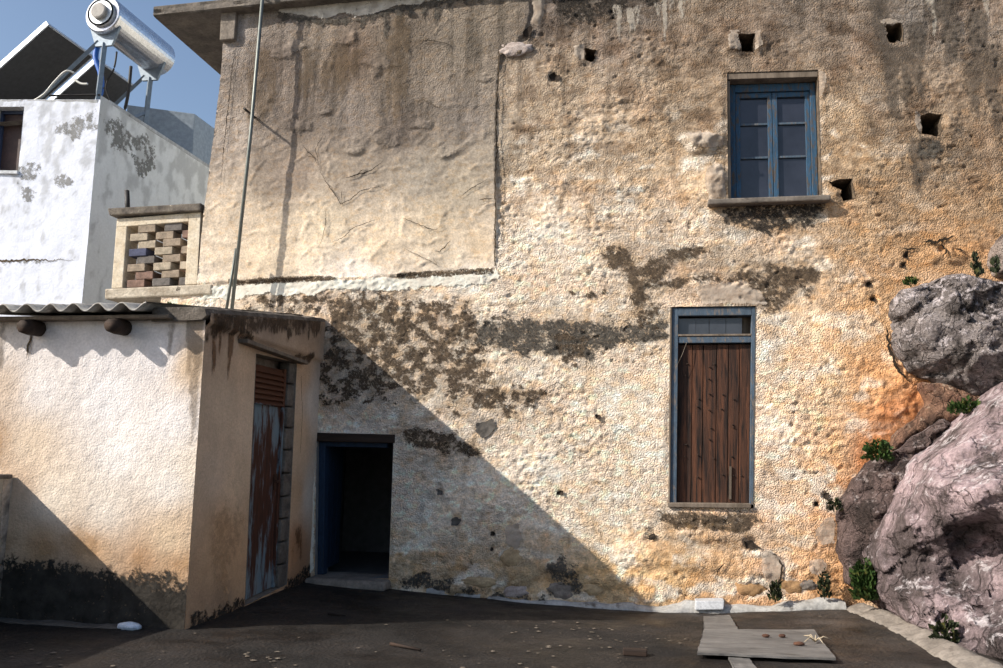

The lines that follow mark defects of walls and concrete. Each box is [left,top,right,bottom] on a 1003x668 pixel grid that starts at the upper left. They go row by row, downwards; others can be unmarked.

damp [277,0,482,38]
peeling [55,113,156,178]
peeling [17,162,41,202]
peeling [54,174,73,188]
crack [304,138,383,244]
crack [0,256,68,264]
crack [406,219,450,265]
damp [722,203,825,240]
damp [206,243,822,418]
crack [885,323,913,385]
damp [398,424,480,458]
damp [0,555,245,629]